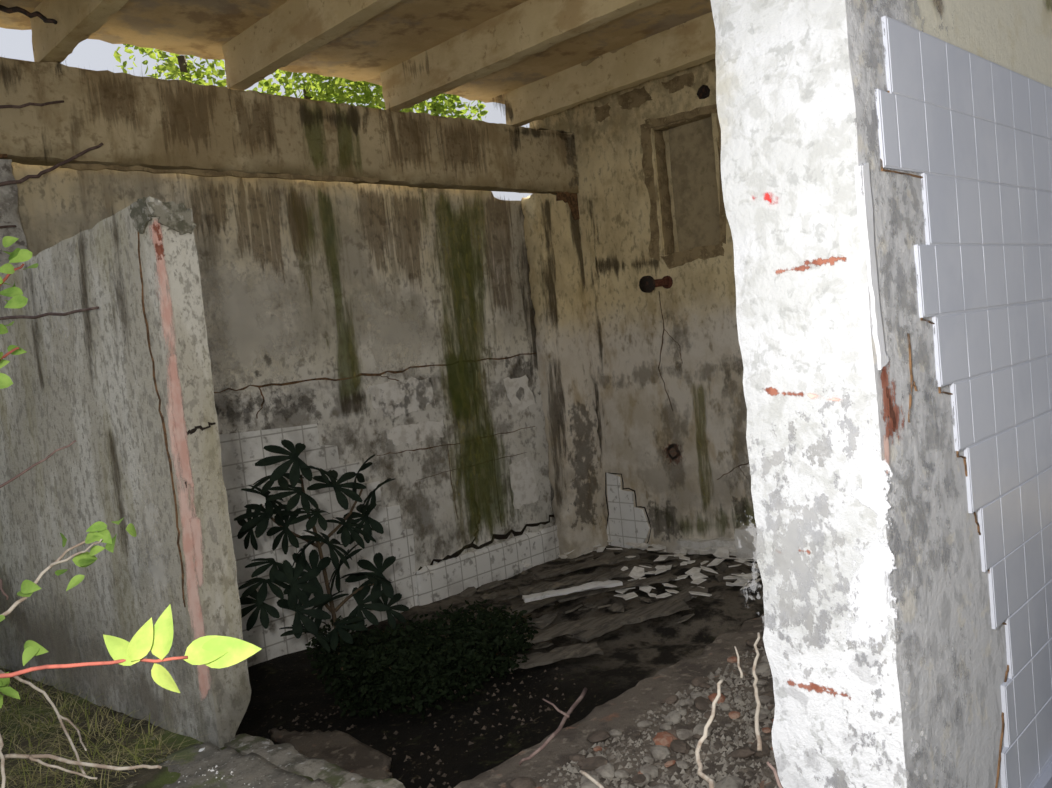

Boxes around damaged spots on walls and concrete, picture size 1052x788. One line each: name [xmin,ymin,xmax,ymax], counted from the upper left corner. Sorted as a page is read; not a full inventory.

leakage [300,103,368,166]
spalling [130,197,197,235]
leakage [291,192,366,416]
corrosion [775,257,846,274]
crack [137,231,216,607]
corrosion [151,219,205,640]
leakage [423,195,514,537]
corrosion [765,387,817,399]
spalling [886,388,896,432]
corrosion [880,365,905,474]
crack [377,426,554,570]
corrosion [787,679,851,700]